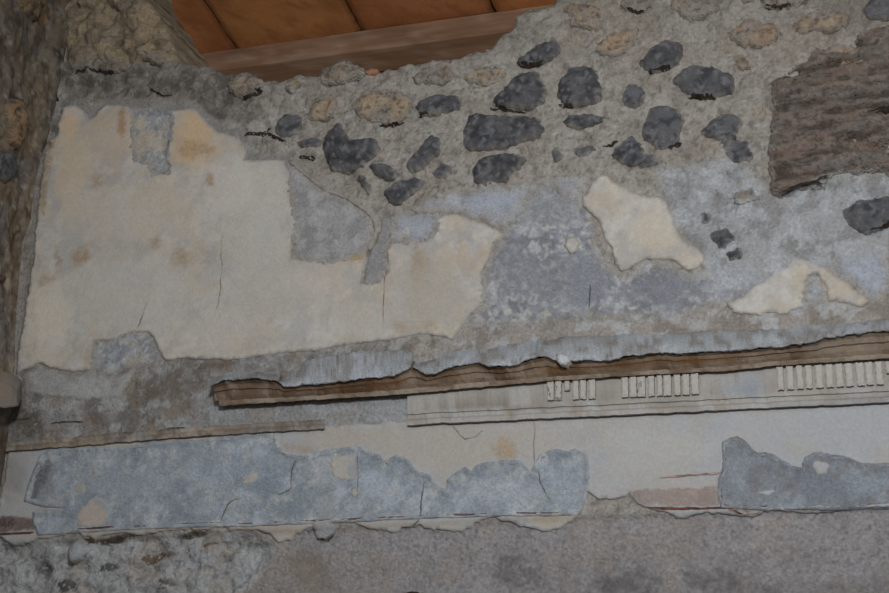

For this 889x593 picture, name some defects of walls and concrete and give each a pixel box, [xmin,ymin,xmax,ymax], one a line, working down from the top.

peeling [129,105,175,178]
crack [215,233,223,314]
peeling [90,330,162,376]
peeling [717,436,889,511]
spalling [57,579,77,593]
spalling [142,552,174,565]